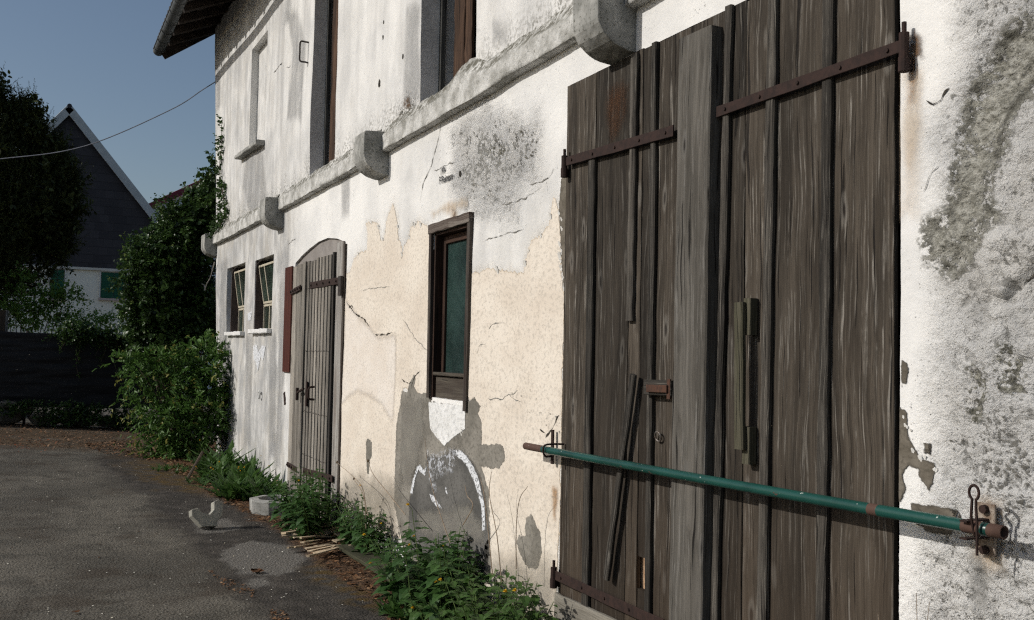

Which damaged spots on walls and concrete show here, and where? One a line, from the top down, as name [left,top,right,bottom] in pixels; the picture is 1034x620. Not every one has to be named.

corrosion [909,34,921,98]
peeling [339,204,434,538]
crack [349,286,425,386]
peeling [468,197,564,620]
spalling [899,407,963,534]
peeling [948,397,1034,521]